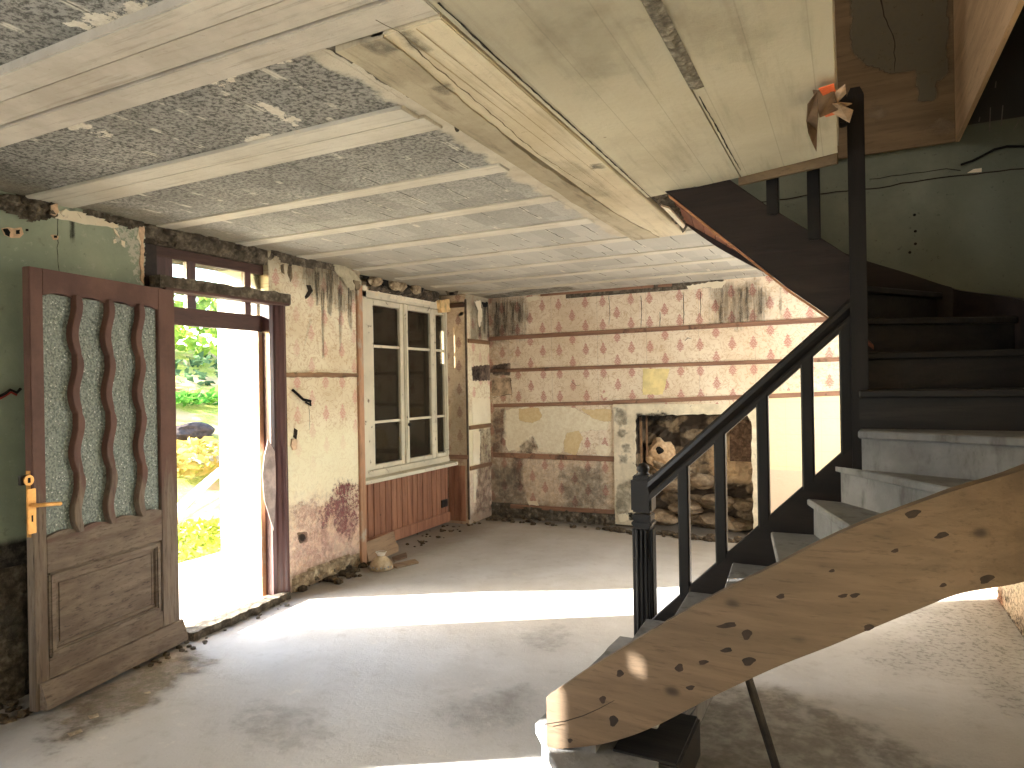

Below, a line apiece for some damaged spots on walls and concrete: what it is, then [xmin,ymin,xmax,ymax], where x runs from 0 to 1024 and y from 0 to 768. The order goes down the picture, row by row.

spalling [0,193,146,285]
damp [476,407,631,526]